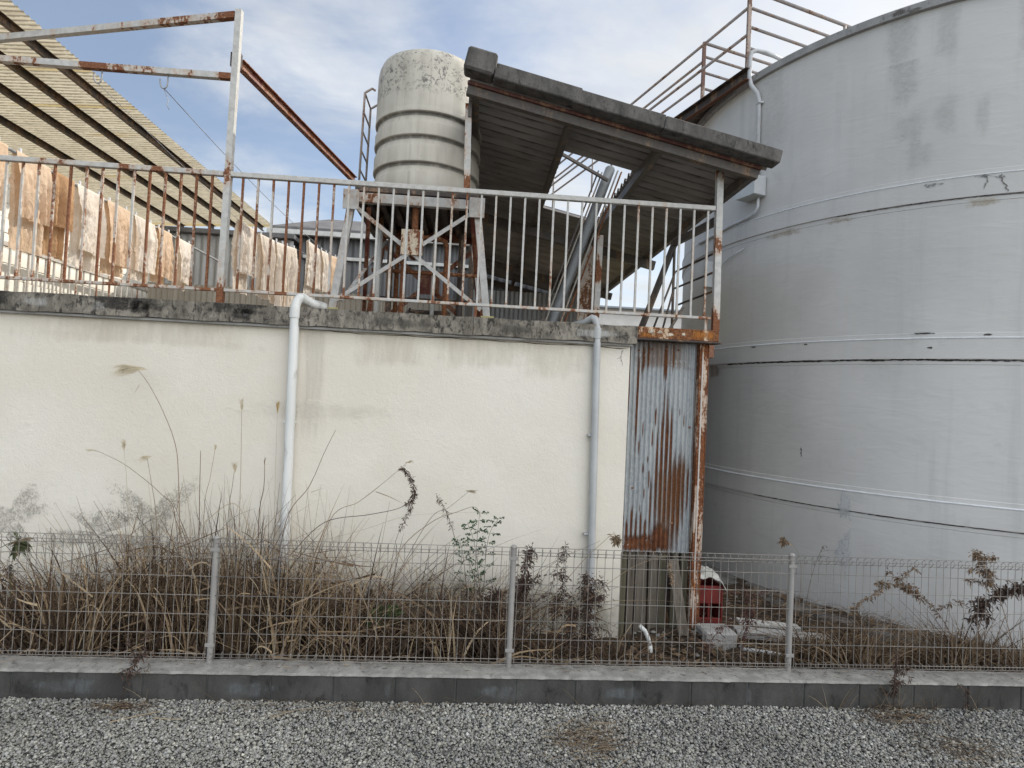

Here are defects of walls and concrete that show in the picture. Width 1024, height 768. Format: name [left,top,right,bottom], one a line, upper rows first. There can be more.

crack [837,174,1024,217]
corrosion [622,332,689,553]